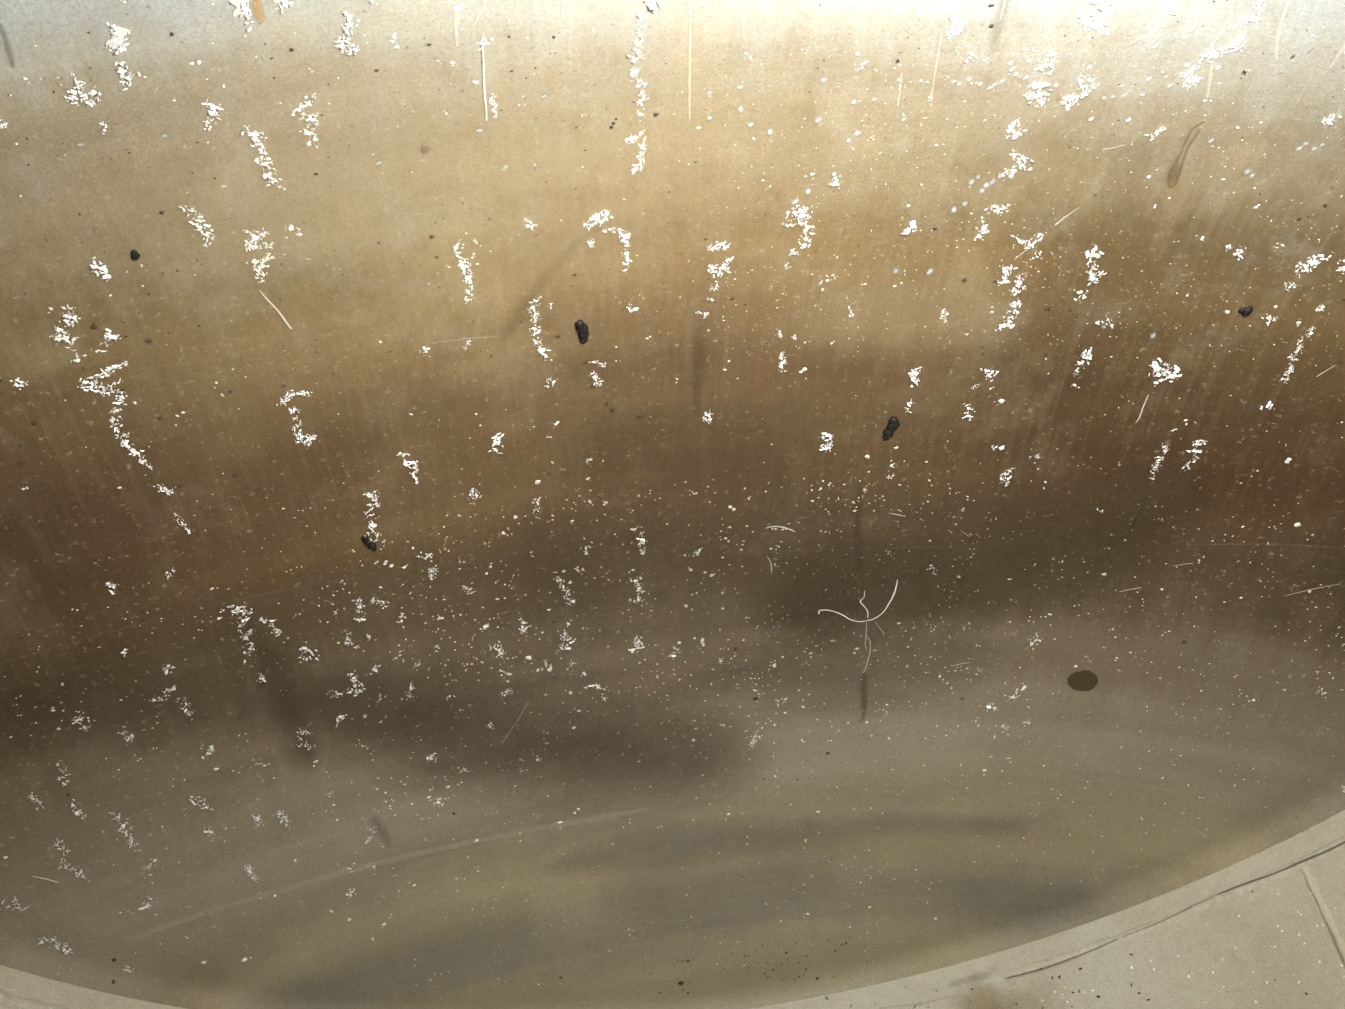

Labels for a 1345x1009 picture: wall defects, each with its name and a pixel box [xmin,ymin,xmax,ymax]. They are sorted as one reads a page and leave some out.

leakage [476,44,487,132]
leakage [951,47,1059,90]
leakage [796,483,1183,607]